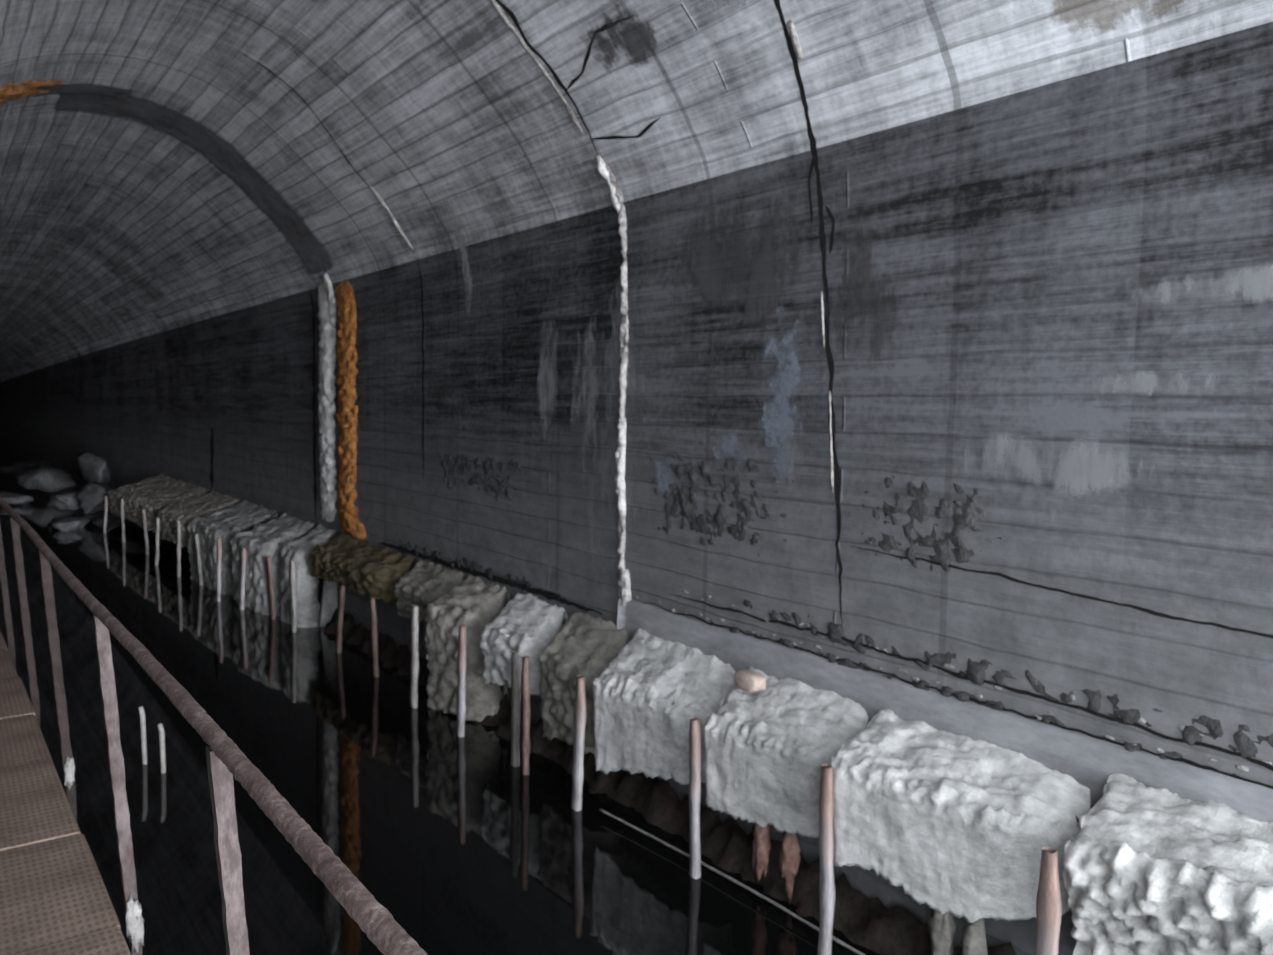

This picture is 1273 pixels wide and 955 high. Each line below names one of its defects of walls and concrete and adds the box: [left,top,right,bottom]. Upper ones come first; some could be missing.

rust [0,79,65,104]
leakage [588,3,656,69]
leakage [34,84,337,522]
crack [774,0,1273,638]
leakage [1156,265,1273,301]
rust [335,280,366,540]
leakage [576,155,635,622]
spalling [646,445,787,557]
leakage [762,322,802,483]
spalling [861,475,1001,572]
leakage [984,435,1127,493]
leakage [1102,372,1188,394]